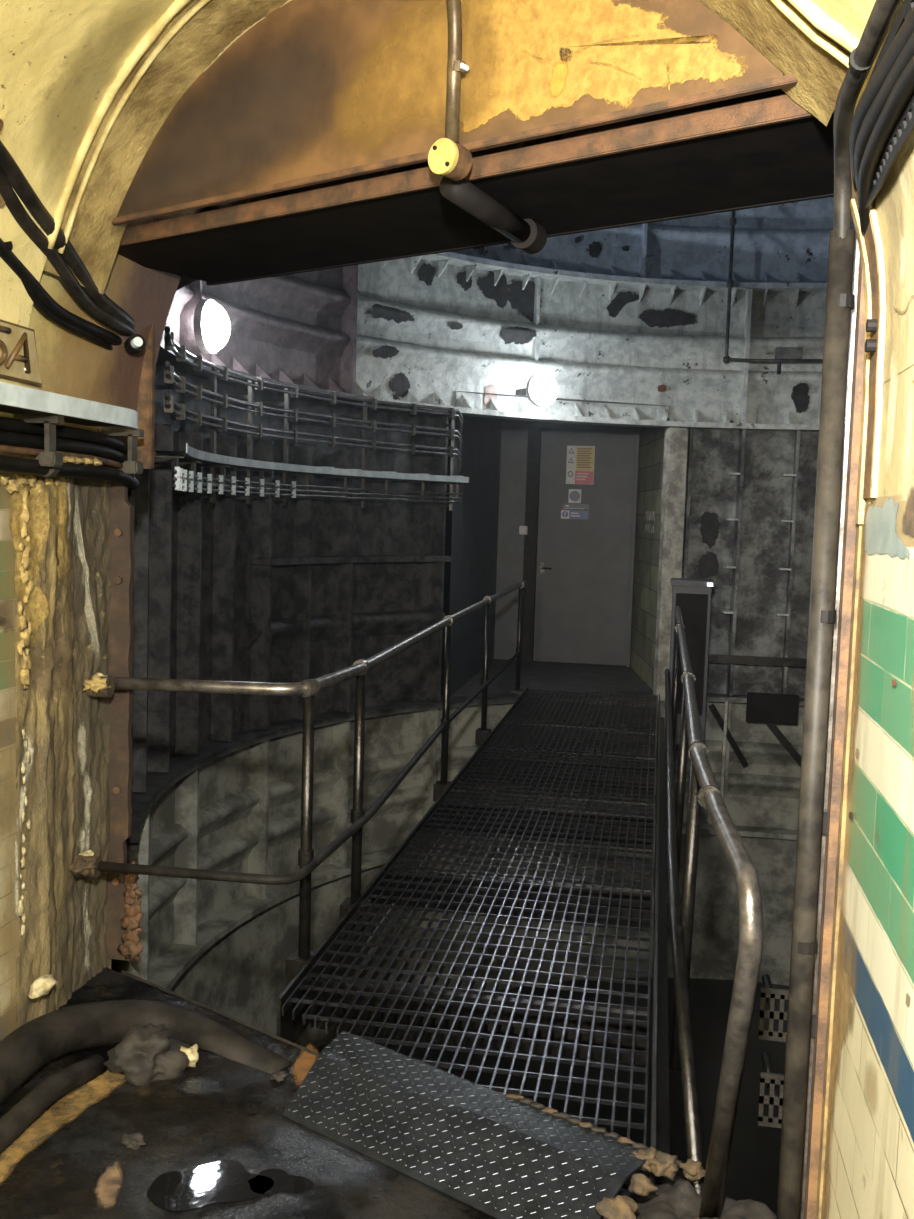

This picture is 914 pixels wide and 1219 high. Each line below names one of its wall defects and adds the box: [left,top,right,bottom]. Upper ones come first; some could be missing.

peeling [204,17,265,72]
peeling [343,0,745,145]
peeling [417,263,436,286]
peeling [372,304,415,324]
peeling [456,271,542,345]
peeling [607,291,696,328]
peeling [373,345,399,359]
peeling [388,372,410,398]
peeling [791,383,810,413]
peeling [864,498,910,559]
flaking render [18,729,31,936]
rust [117,861,143,962]